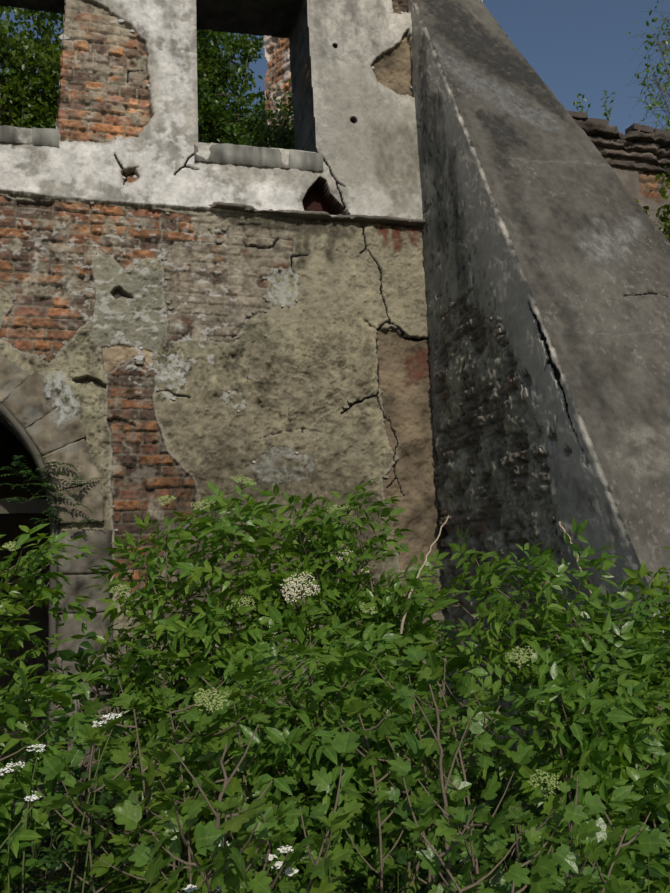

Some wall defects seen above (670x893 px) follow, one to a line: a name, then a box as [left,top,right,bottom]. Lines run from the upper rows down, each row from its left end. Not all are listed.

flaking render [57,0,153,143]
flaking render [371,33,413,97]
flaking render [392,0,410,14]
crack [114,154,138,185]
crack [174,154,198,175]
crack [315,151,346,210]
flaking render [0,196,300,361]
crack [245,240,308,268]
crack [341,226,429,496]
crack [530,307,584,451]
flaking render [101,345,196,594]
flaking render [377,297,563,675]